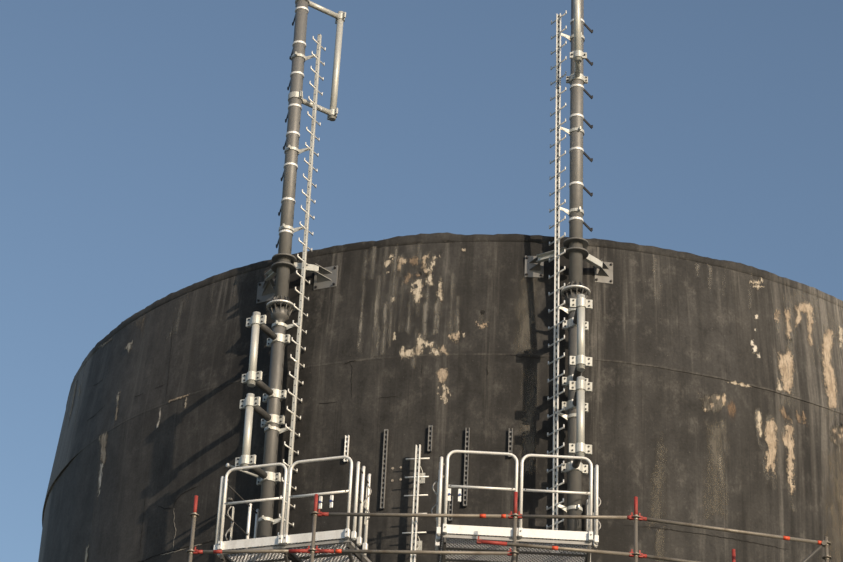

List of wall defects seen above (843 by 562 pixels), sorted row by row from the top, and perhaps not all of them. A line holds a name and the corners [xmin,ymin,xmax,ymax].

peeling [384,253,443,308]
peeling [392,331,465,364]
spalling [435,368,451,405]
peeling [755,294,843,494]
spalling [97,431,108,497]